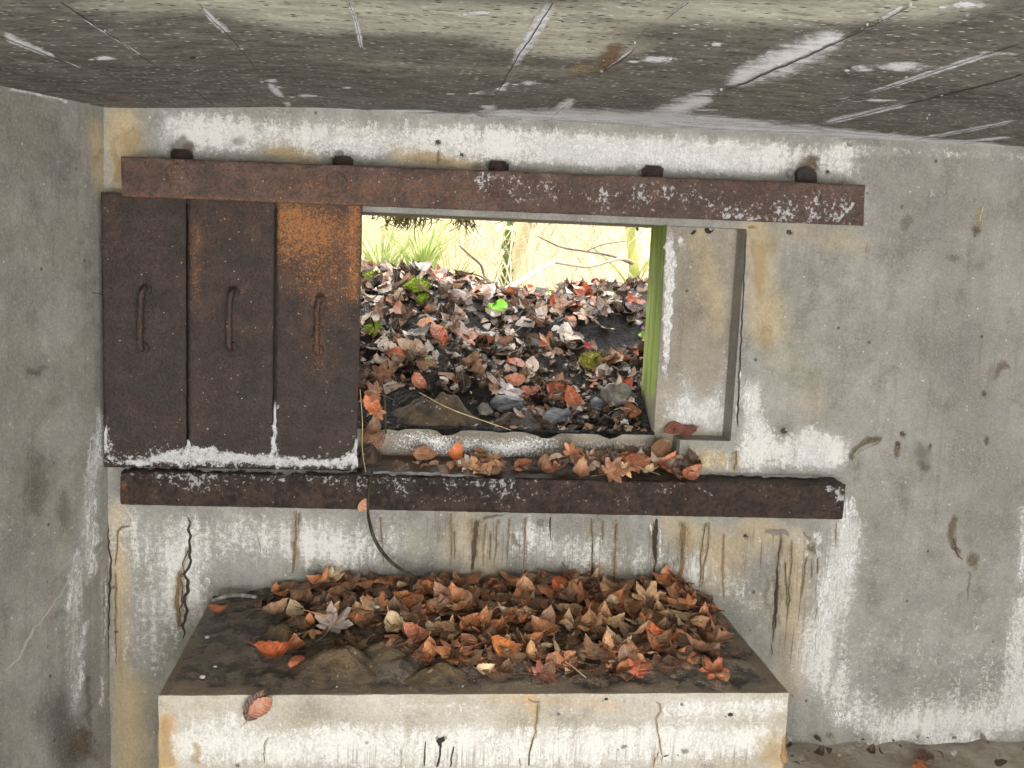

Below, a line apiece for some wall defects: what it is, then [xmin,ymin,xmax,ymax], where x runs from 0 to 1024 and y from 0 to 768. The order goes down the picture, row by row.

crack [735,233,747,425]
leakage [88,415,108,461]
leakage [125,402,358,476]
leakage [65,473,108,654]
crack [175,518,192,639]
leakage [512,517,551,569]
leakage [649,519,661,578]
leakage [73,621,87,698]